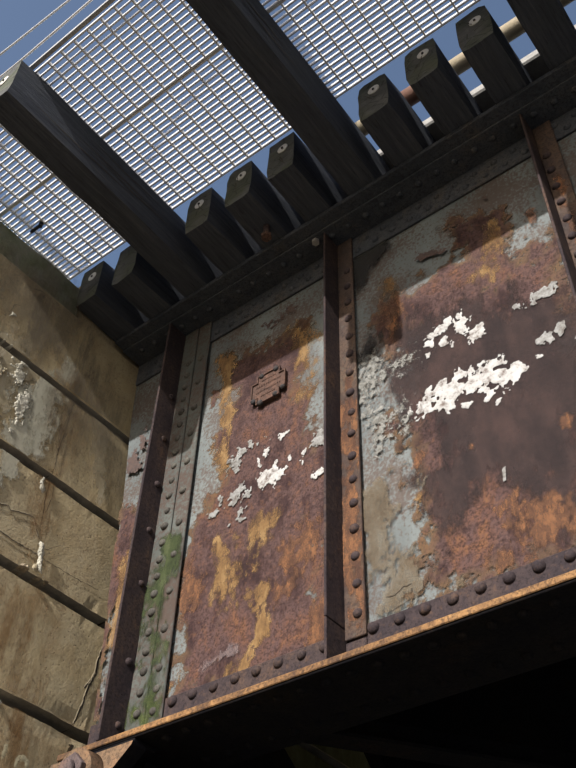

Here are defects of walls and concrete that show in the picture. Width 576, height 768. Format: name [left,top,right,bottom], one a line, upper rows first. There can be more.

peeling [0,321,39,413]
crack [0,404,98,590]
rust [165,298,325,699]
peeling [206,428,324,527]
rust [340,376,365,628]
peeling [357,309,529,460]
rust [365,203,576,608]
peeling [512,281,559,310]
peeling [535,320,566,359]
crack [61,620,108,752]
rust [94,502,138,721]
water stain [139,533,182,640]